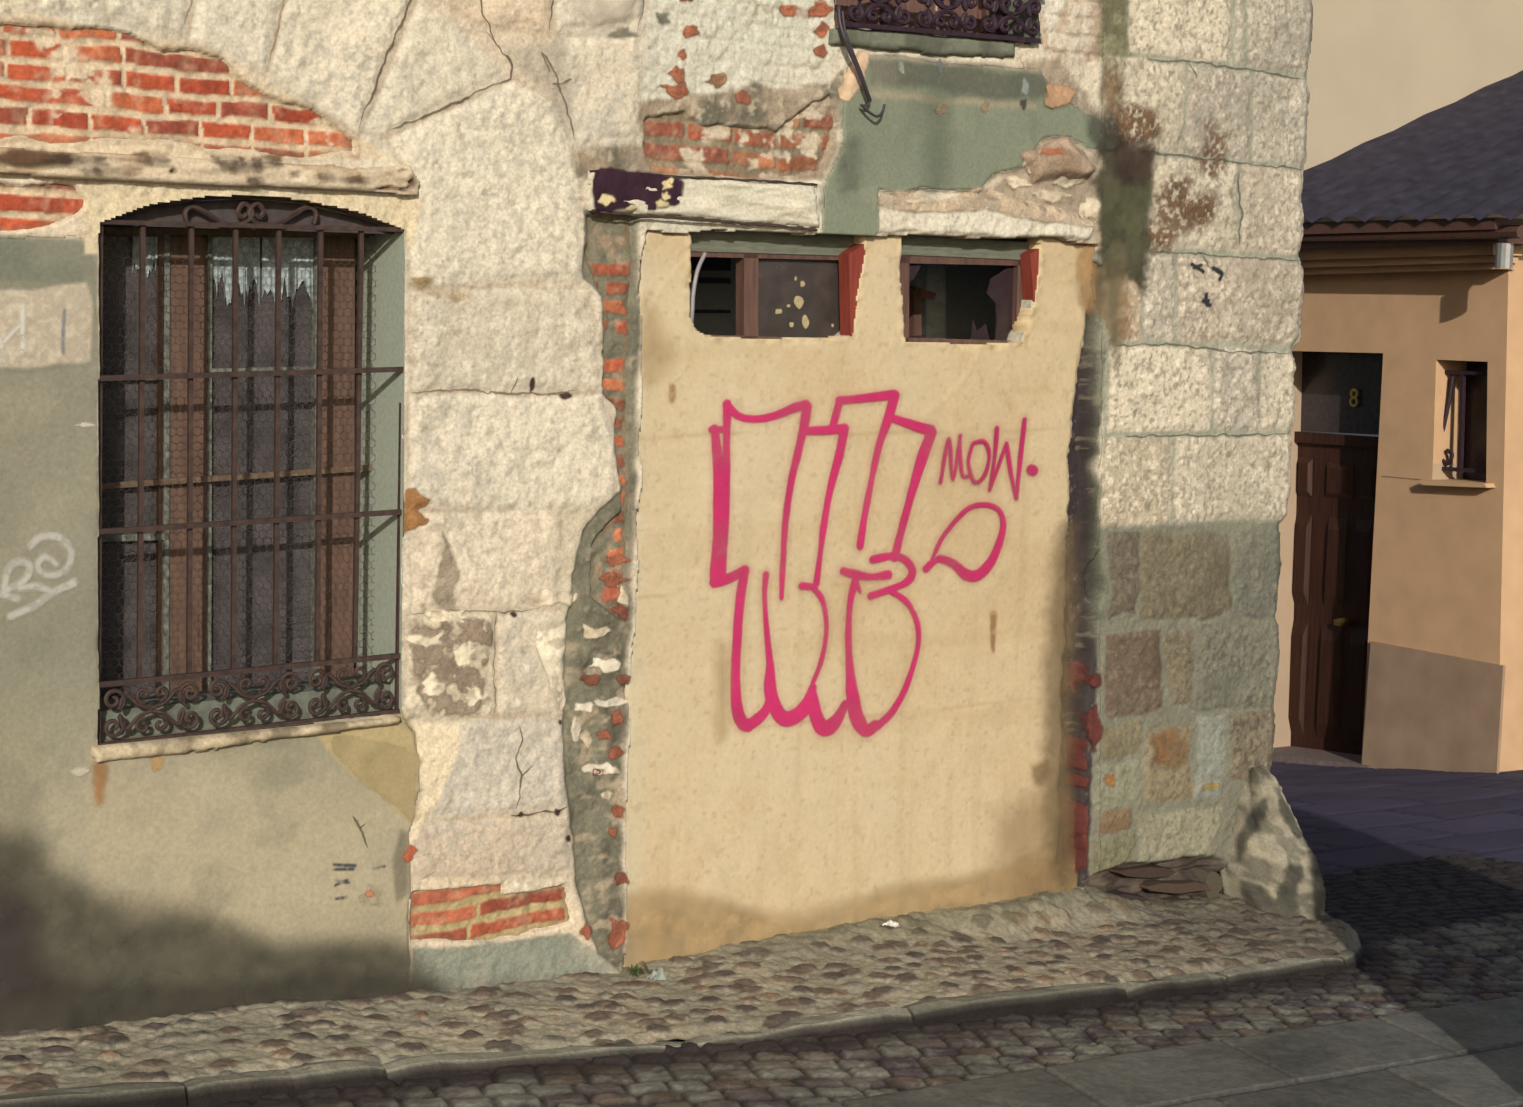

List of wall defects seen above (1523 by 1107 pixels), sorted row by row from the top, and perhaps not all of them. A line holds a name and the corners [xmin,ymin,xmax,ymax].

flaking render [0,24,353,158]